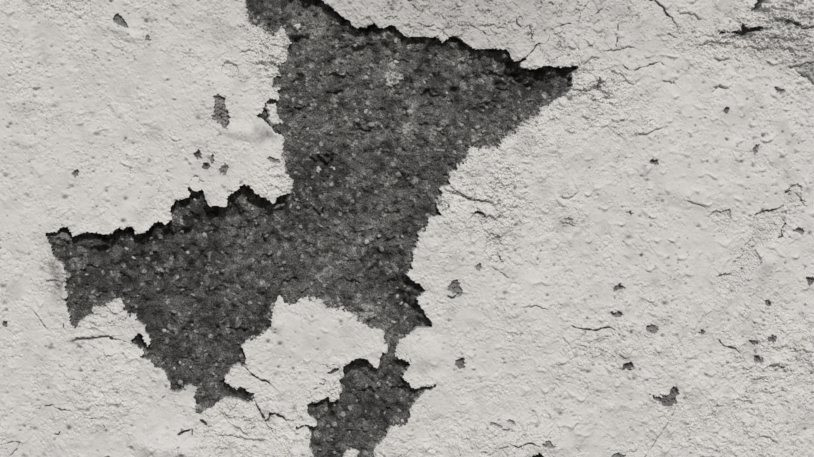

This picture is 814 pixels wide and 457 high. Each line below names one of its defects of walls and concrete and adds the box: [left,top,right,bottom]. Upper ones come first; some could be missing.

peeling [45,0,576,457]
crack [719,3,814,36]